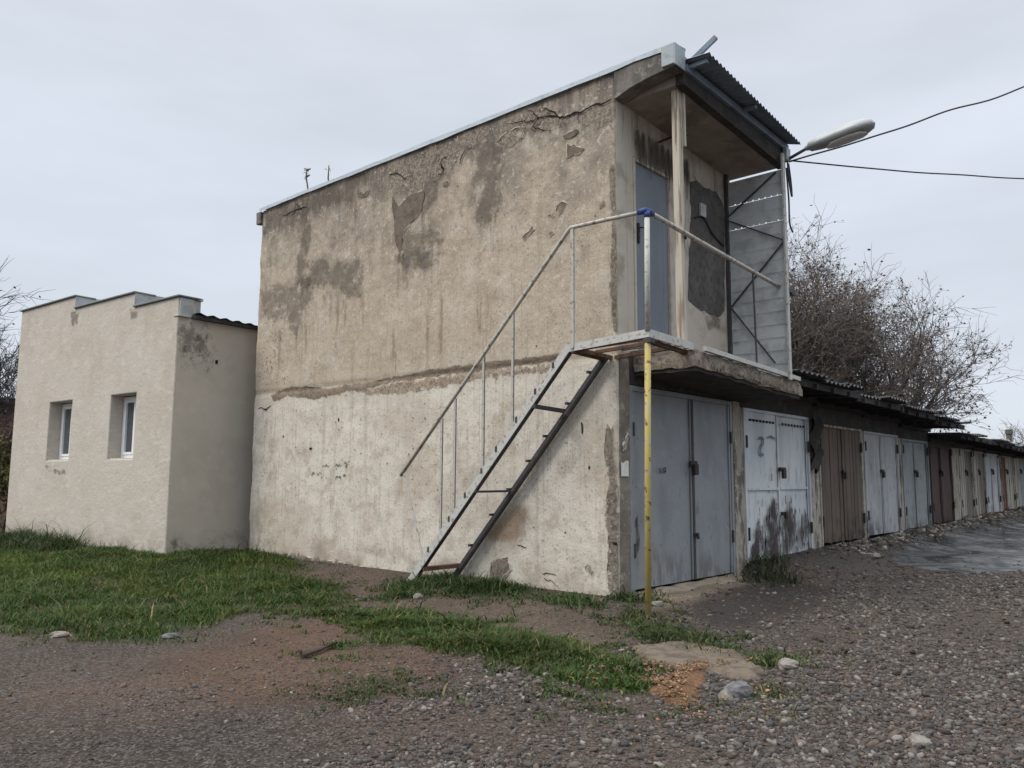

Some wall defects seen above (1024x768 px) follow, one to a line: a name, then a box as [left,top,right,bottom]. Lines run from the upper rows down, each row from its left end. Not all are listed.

crack [504,99,611,131]
flaking render [387,104,612,255]
flaking render [260,319,560,417]
flaking render [490,556,513,580]